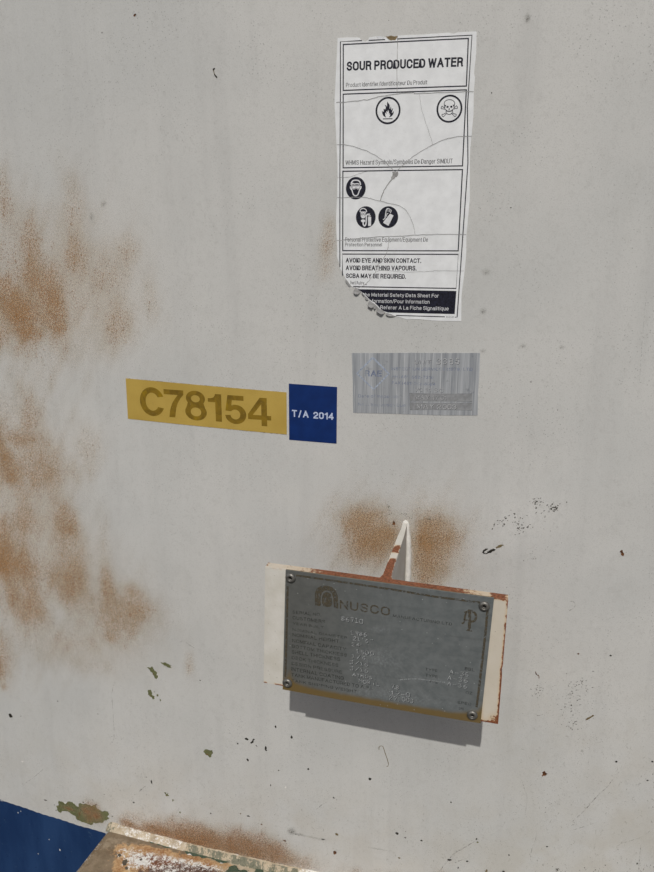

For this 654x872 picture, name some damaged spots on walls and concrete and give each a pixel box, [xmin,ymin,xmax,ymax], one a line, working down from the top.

rust [0,179,134,363]
peeling [56,799,113,825]
rust [119,815,302,866]